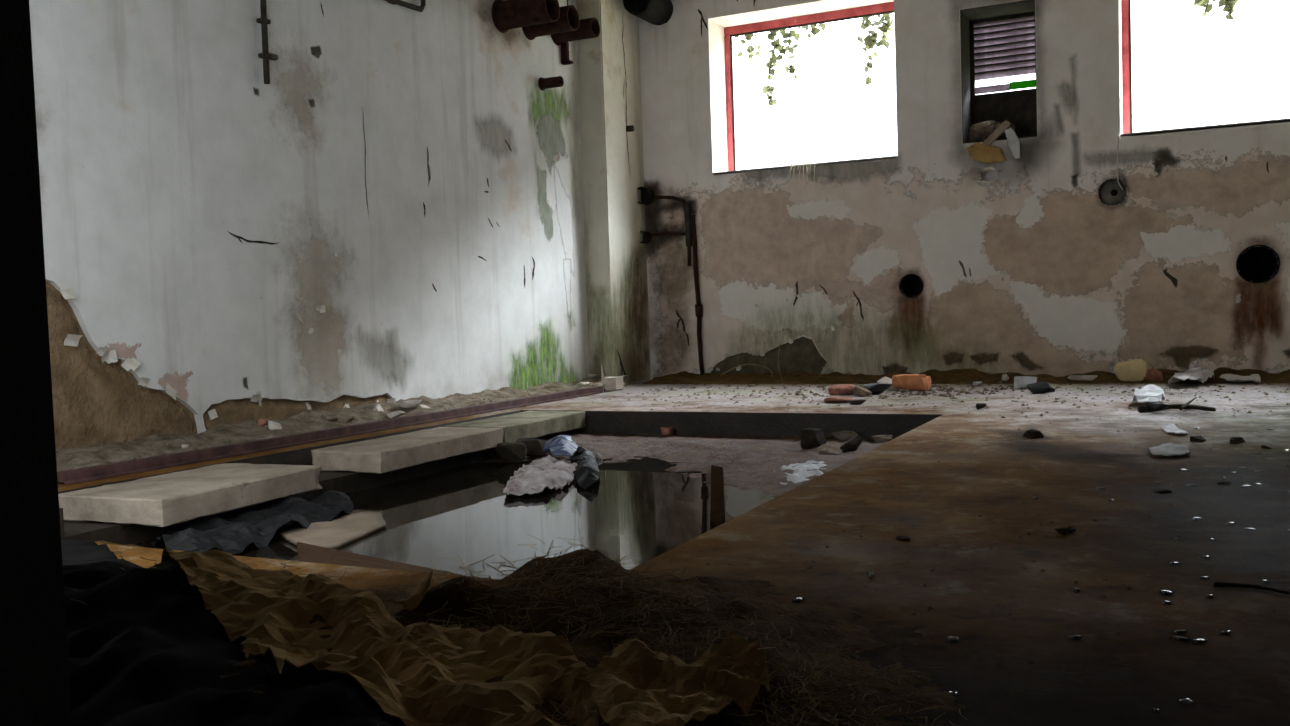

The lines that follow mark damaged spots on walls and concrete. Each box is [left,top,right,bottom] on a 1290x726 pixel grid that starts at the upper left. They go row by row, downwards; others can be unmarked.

crack [229,232,280,245]
peeling [648,148,1290,377]
flaking render [46,281,396,449]
leakage [513,325,551,385]
rust [891,296,924,349]
rust [1236,276,1280,362]